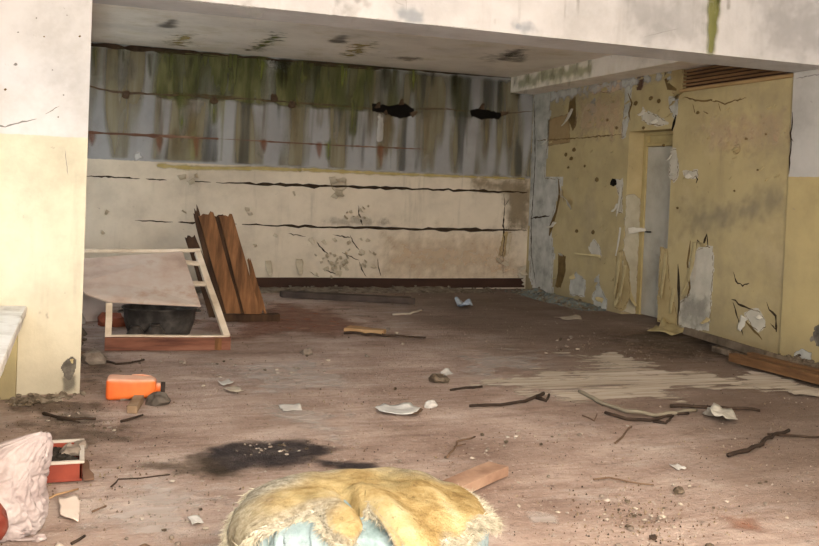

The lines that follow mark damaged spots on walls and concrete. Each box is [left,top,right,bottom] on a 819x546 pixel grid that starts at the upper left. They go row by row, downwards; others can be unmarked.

crack [65,151,165,181]
water stain [93,48,151,160]
crack [135,218,195,226]
water stain [153,52,531,227]
crack [195,181,527,267]
peeling [496,92,607,311]
peeling [610,178,646,314]
peeling [615,69,684,139]
peeling [662,144,699,183]
peeling [656,234,714,331]
peeling [731,299,766,340]
spalling [810,324,819,346]